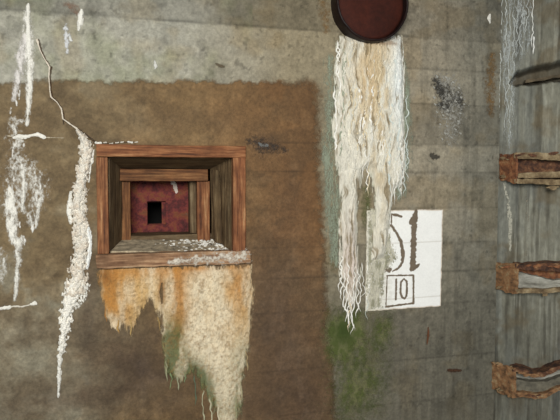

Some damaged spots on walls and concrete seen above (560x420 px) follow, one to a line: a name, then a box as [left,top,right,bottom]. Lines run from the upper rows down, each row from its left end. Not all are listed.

crack [36,39,138,144]
efflorescence [499,0,535,146]
leakage [0,3,413,420]